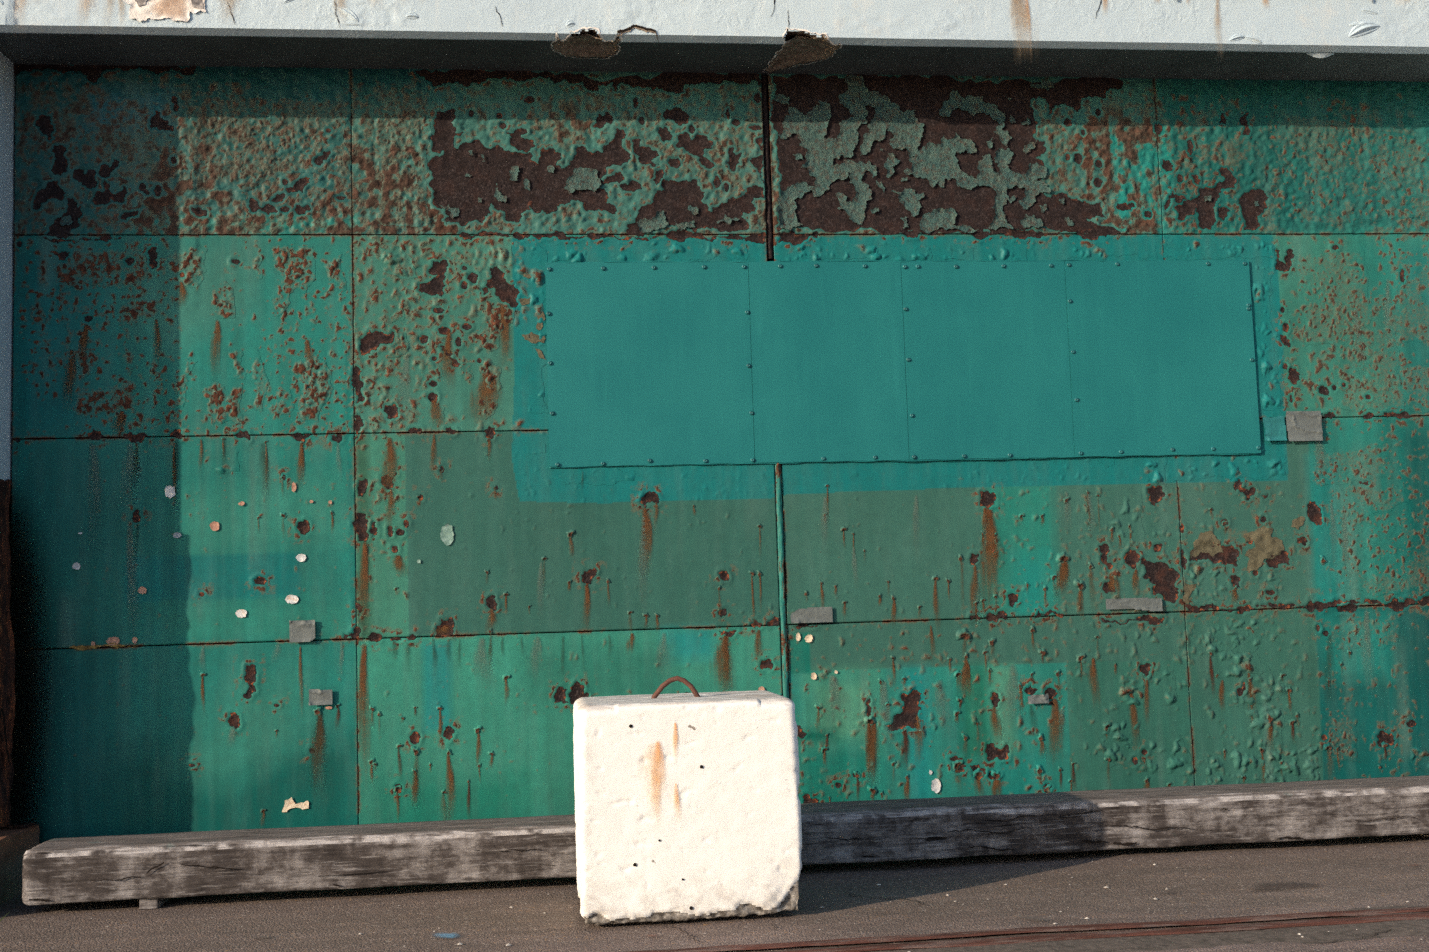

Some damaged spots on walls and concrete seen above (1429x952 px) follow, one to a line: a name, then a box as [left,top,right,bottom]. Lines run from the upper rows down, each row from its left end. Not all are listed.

peeling [123,0,206,22]
rust [79,90,352,194]
peeling [415,24,1268,245]
rust [252,245,346,316]
rust [35,248,160,427]
rust [165,247,333,449]
rust [643,503,657,551]
rust [717,636,728,680]
rust [652,723,679,805]
rust [1036,699,1076,793]
rust [1239,654,1299,772]
rust [1322,716,1360,765]